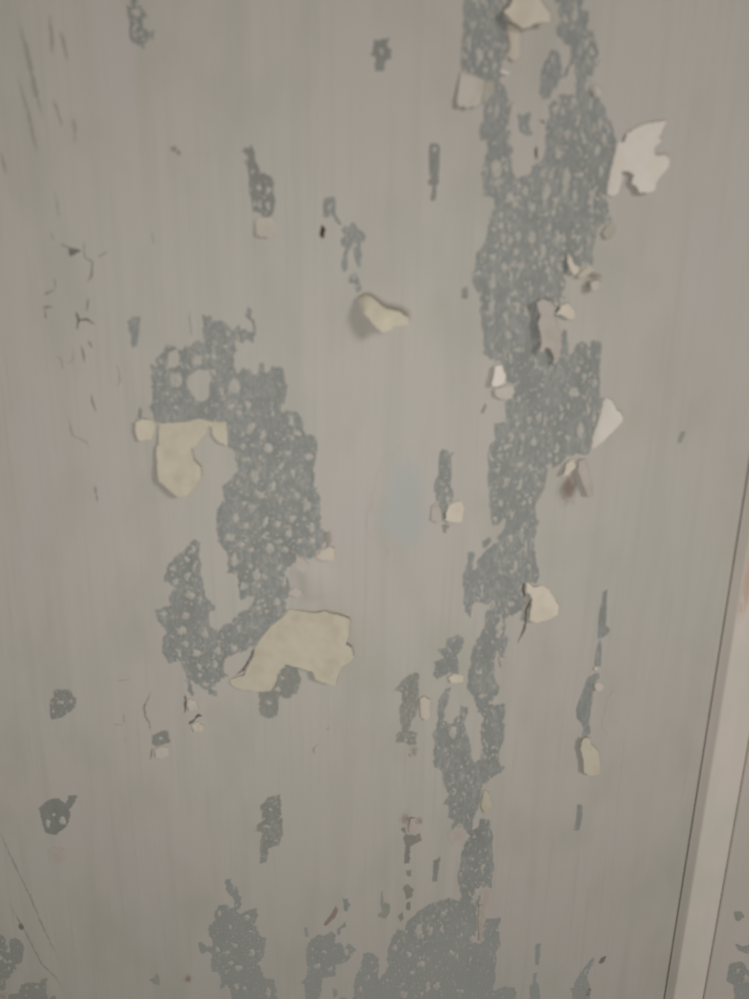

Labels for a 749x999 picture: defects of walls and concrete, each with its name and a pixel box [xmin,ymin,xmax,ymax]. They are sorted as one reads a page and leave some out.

peeling [243,145,276,237]
peeling [135,307,354,732]
peeling [301,0,670,999]
peeling [50,689,77,720]
peeling [38,795,78,835]
peeling [256,795,283,863]
peeling [0,924,56,999]
peeling [198,879,277,999]